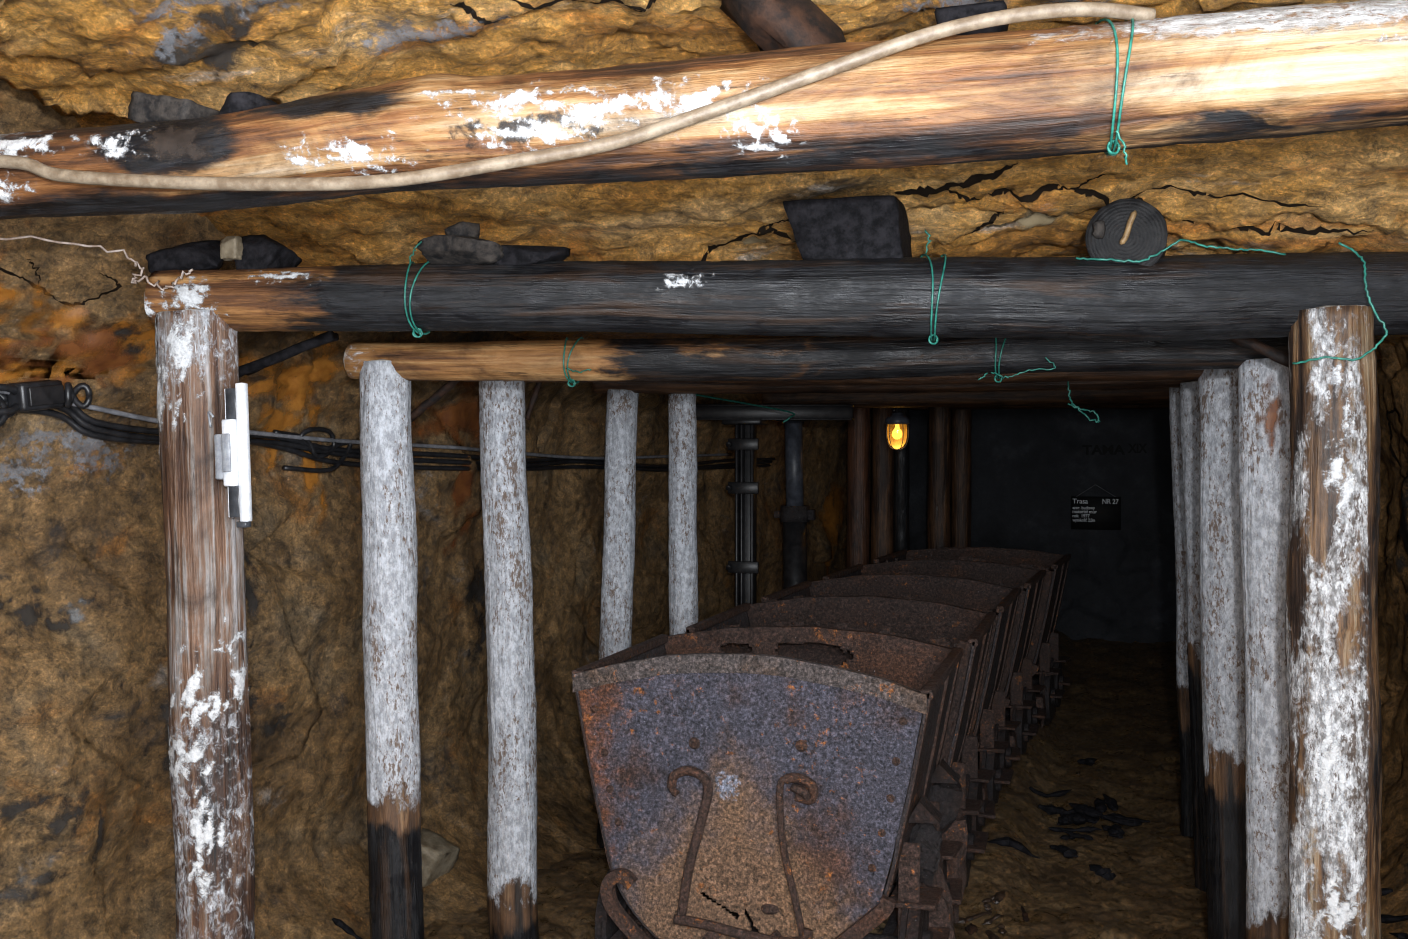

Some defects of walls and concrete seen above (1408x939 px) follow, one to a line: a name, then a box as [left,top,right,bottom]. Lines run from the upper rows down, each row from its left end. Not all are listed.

leakage [0,135,52,156]
leakage [423,77,731,151]
leakage [724,105,797,158]
leakage [0,180,34,203]
leakage [1323,365,1356,541]
leakage [160,550,266,902]
leakage [1317,671,1347,842]
leakage [1291,871,1367,939]